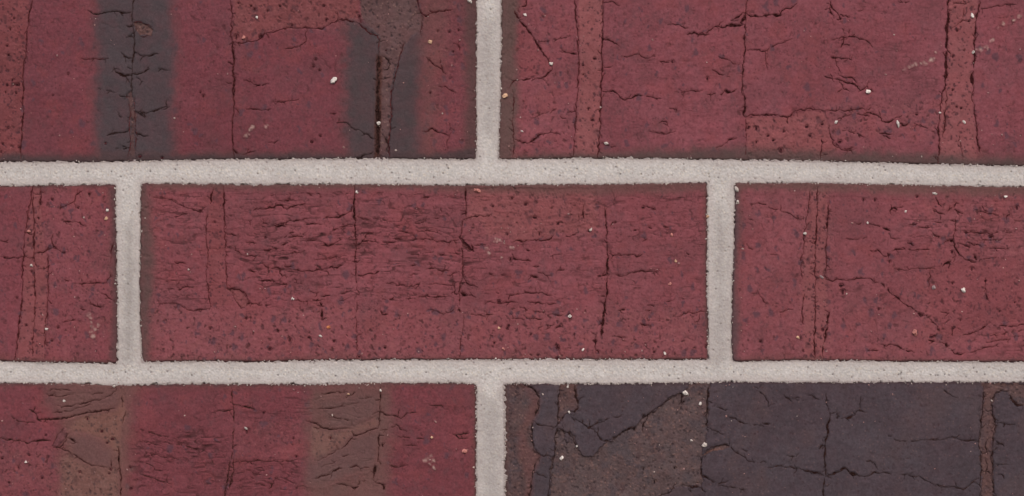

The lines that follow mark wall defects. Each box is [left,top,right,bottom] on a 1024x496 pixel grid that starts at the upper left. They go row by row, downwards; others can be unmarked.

crack [81,0,168,149]
crack [226,1,298,154]
crack [330,55,391,159]
crack [603,0,797,147]
crack [814,2,934,158]
crack [224,185,706,355]
crack [824,199,1024,355]
crack [3,388,124,444]
crack [111,430,197,496]
crack [212,392,293,496]
crack [313,386,443,490]
crack [708,386,1013,496]